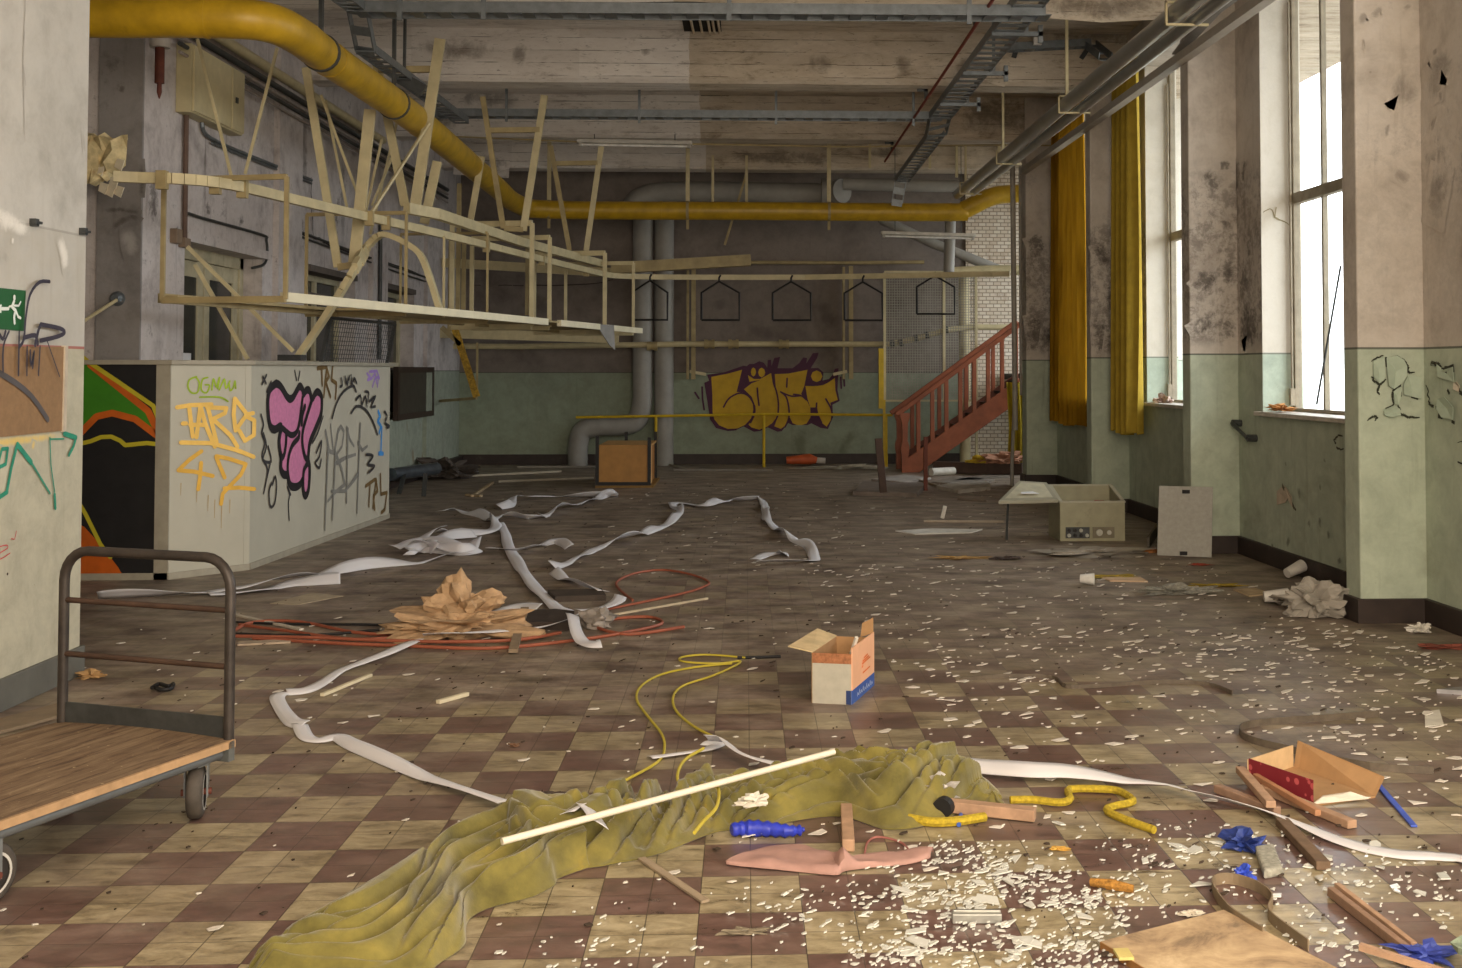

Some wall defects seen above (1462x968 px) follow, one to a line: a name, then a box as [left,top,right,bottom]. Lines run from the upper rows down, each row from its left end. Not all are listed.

mould [1200,154,1248,196]
mould [1184,239,1261,356]